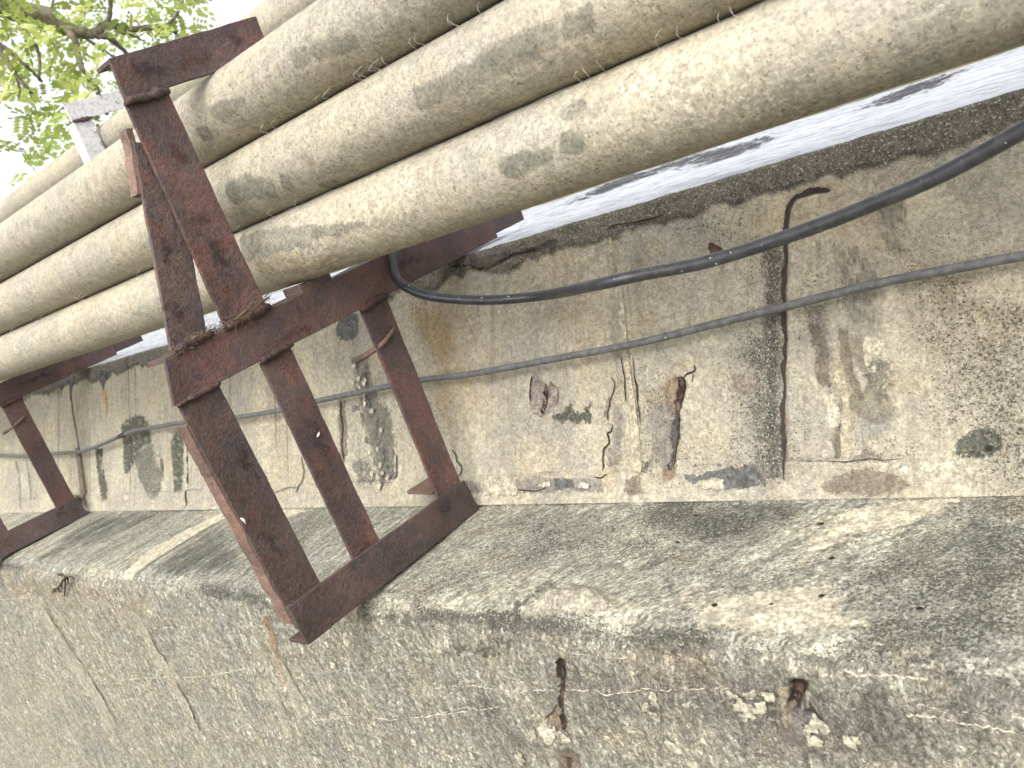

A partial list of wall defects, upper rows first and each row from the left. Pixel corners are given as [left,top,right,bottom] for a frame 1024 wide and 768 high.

crack [779,187,830,479]
spalling [529,374,559,417]
crack [602,355,638,471]
peeling [647,365,766,490]
leakage [135,444,164,497]
peeling [530,719,571,746]
spalling [726,679,861,752]